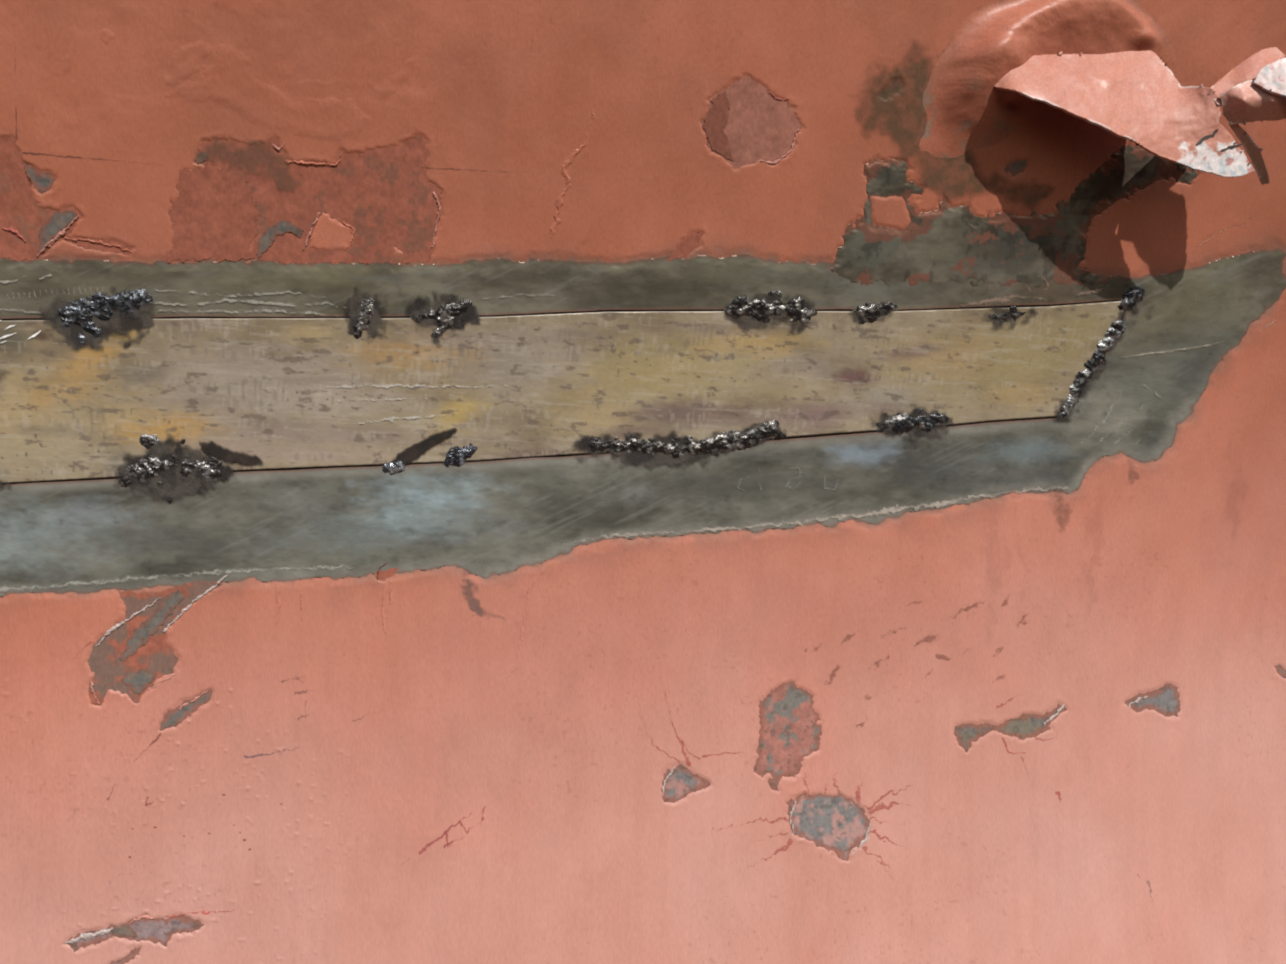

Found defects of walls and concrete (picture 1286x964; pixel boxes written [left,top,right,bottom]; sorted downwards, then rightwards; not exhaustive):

peeling [701,76,802,169]
peeling [0,136,133,262]
peeling [166,135,442,266]
crack [545,104,596,247]
peeling [88,570,232,706]
peeling [160,688,213,731]
peeling [661,764,711,803]
peeling [754,681,871,861]
crack [760,780,902,864]
peeling [954,703,1067,754]
peeling [1124,683,1181,717]
peeling [65,909,235,964]